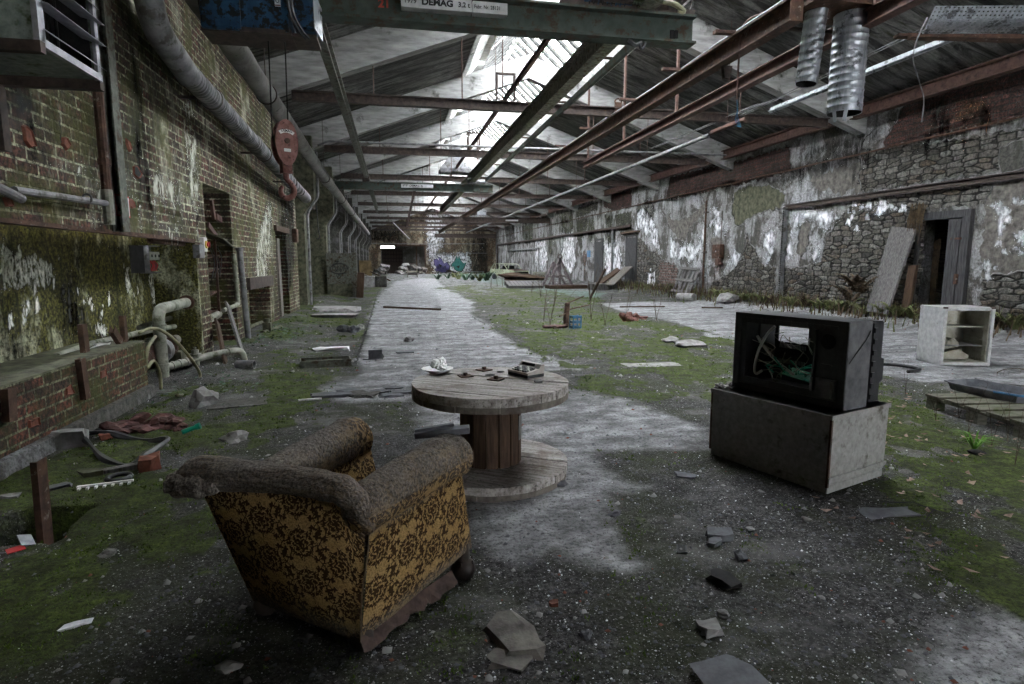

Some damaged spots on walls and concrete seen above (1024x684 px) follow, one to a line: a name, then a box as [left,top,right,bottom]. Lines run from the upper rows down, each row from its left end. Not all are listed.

water stain [184,105,198,198]
flaking render [666,69,1024,319]
water stain [59,280,84,328]